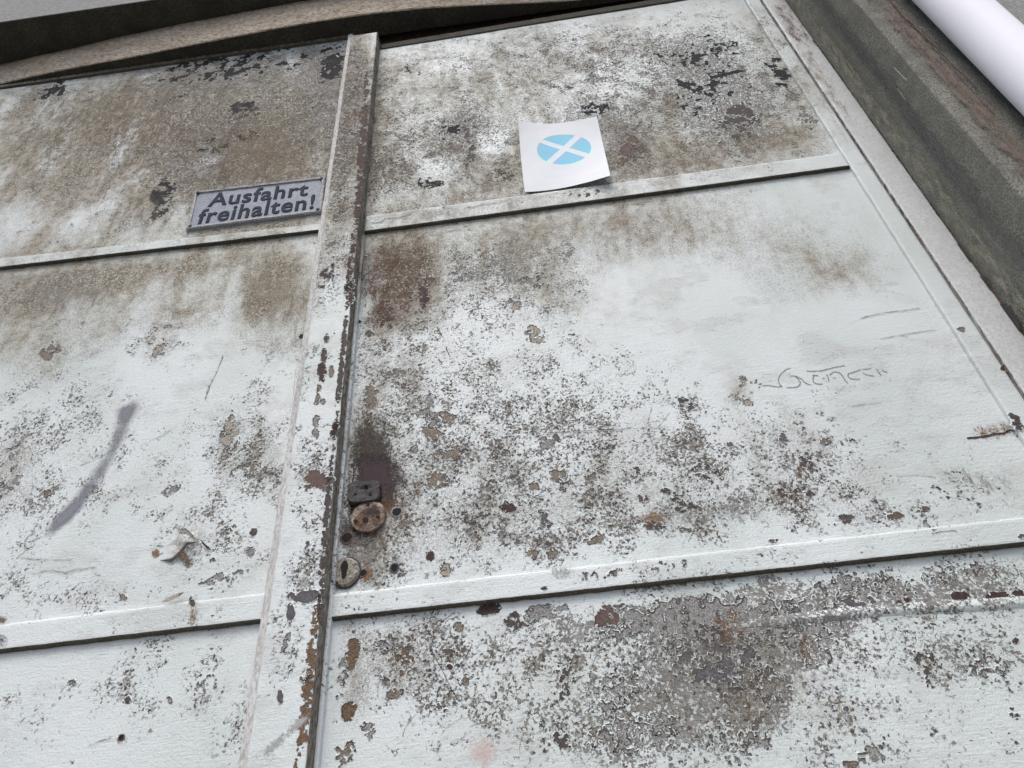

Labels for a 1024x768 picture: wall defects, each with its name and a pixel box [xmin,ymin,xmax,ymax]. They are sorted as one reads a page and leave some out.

damp [13,66,326,190]
peeling [148,41,361,223]
peeling [642,34,763,143]
peeling [762,53,792,91]
rust [293,59,370,768]
peeling [408,392,461,489]
peeling [527,433,569,493]
peeling [642,487,702,534]
peeling [162,521,258,608]
peeling [425,550,455,578]
peeling [476,586,569,633]
peeling [552,559,999,768]